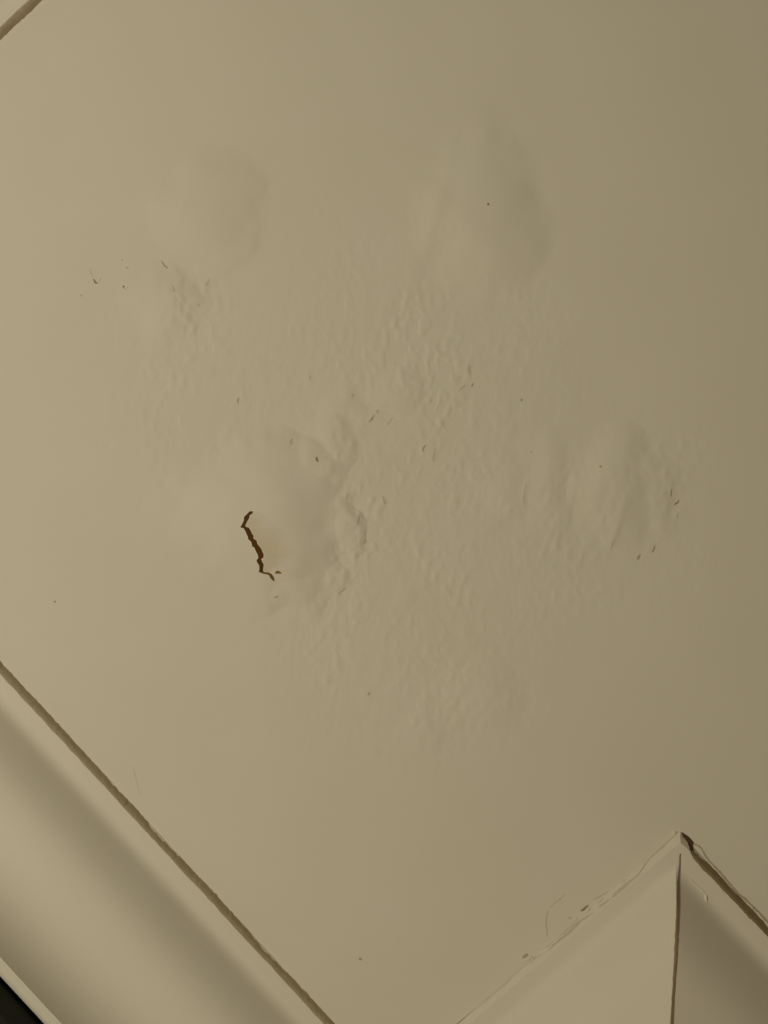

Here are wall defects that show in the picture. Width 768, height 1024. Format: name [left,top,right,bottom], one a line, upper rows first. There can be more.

crack [239,511,281,581]